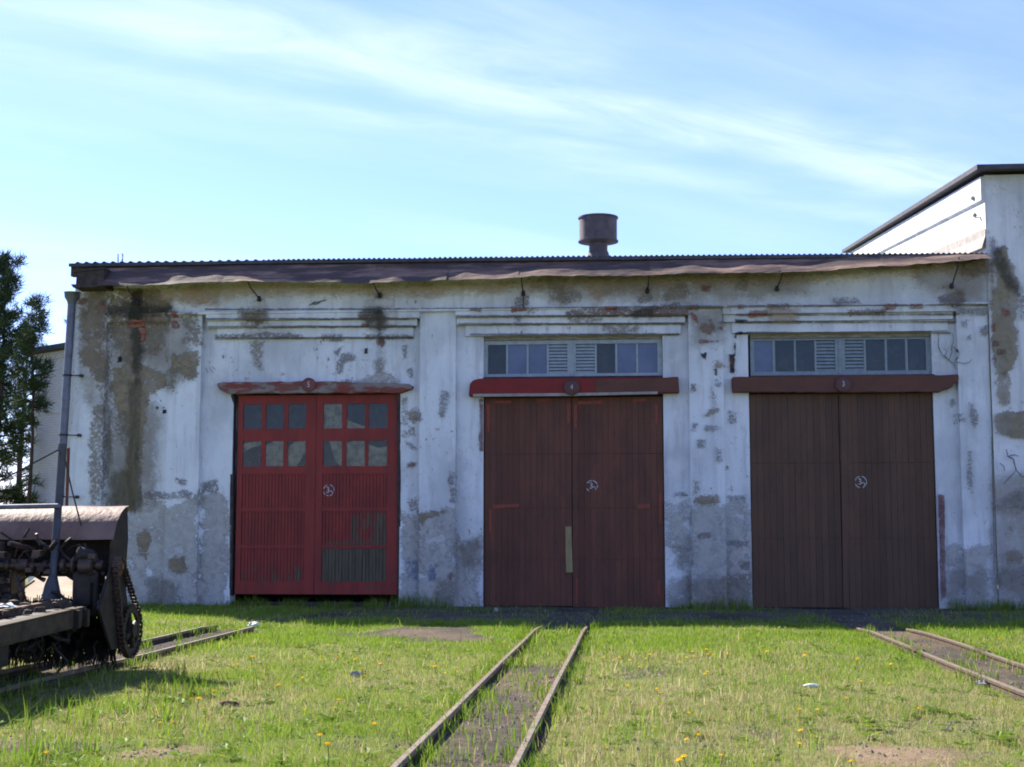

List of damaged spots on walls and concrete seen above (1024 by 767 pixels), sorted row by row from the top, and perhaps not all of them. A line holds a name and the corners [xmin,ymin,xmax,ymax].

flaking render [78,285,203,402]
leakage [88,286,416,511]
leakage [338,284,476,310]
flaking render [402,397,421,450]
flaking render [847,303,897,317]
flaking render [951,246,1024,438]
flaking render [126,478,231,606]
flaking render [399,472,483,607]
flaking render [664,482,752,608]
flaking render [944,542,1023,609]
crack [991,437,1024,575]